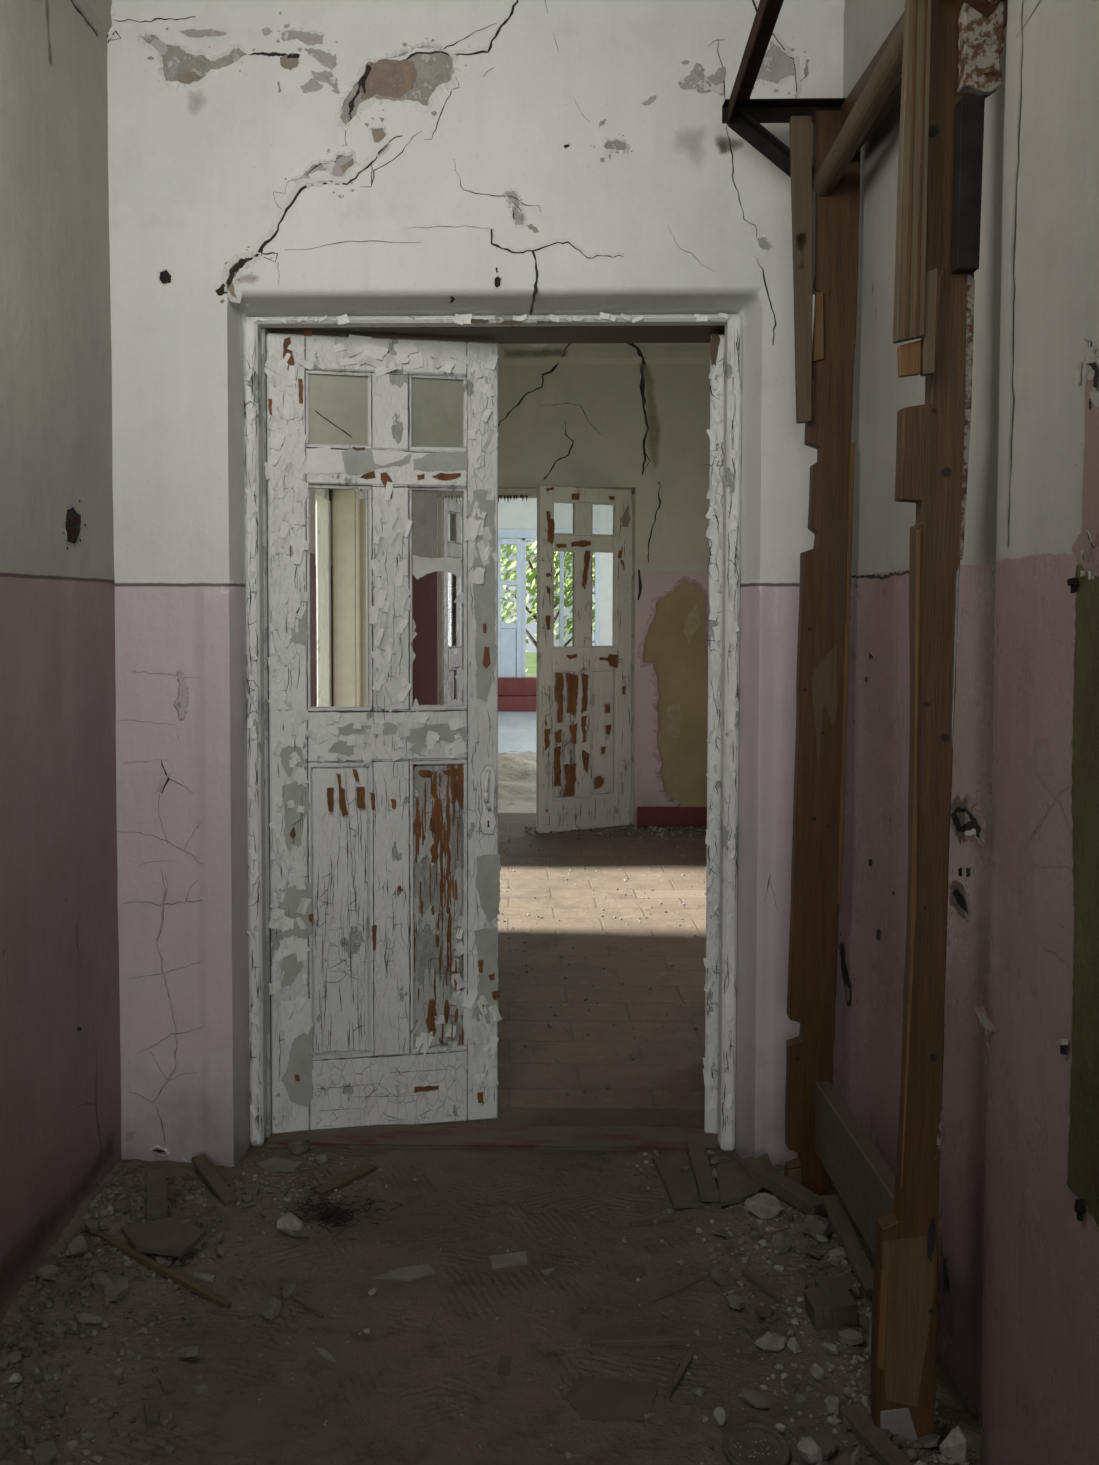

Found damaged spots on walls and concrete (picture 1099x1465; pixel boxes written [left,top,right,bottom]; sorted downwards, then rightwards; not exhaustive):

spalling [136,12,466,198]
crack [212,0,624,315]
crack [752,0,807,98]
peeling [453,312,644,325]
peeling [546,511,591,589]
crack [541,343,661,828]
peeling [1075,339,1099,580]
crack [119,720,203,1143]
crack [243,340,601,1130]
peeling [544,654,626,797]
spalling [637,313,740,1120]
spalling [950,782,987,849]